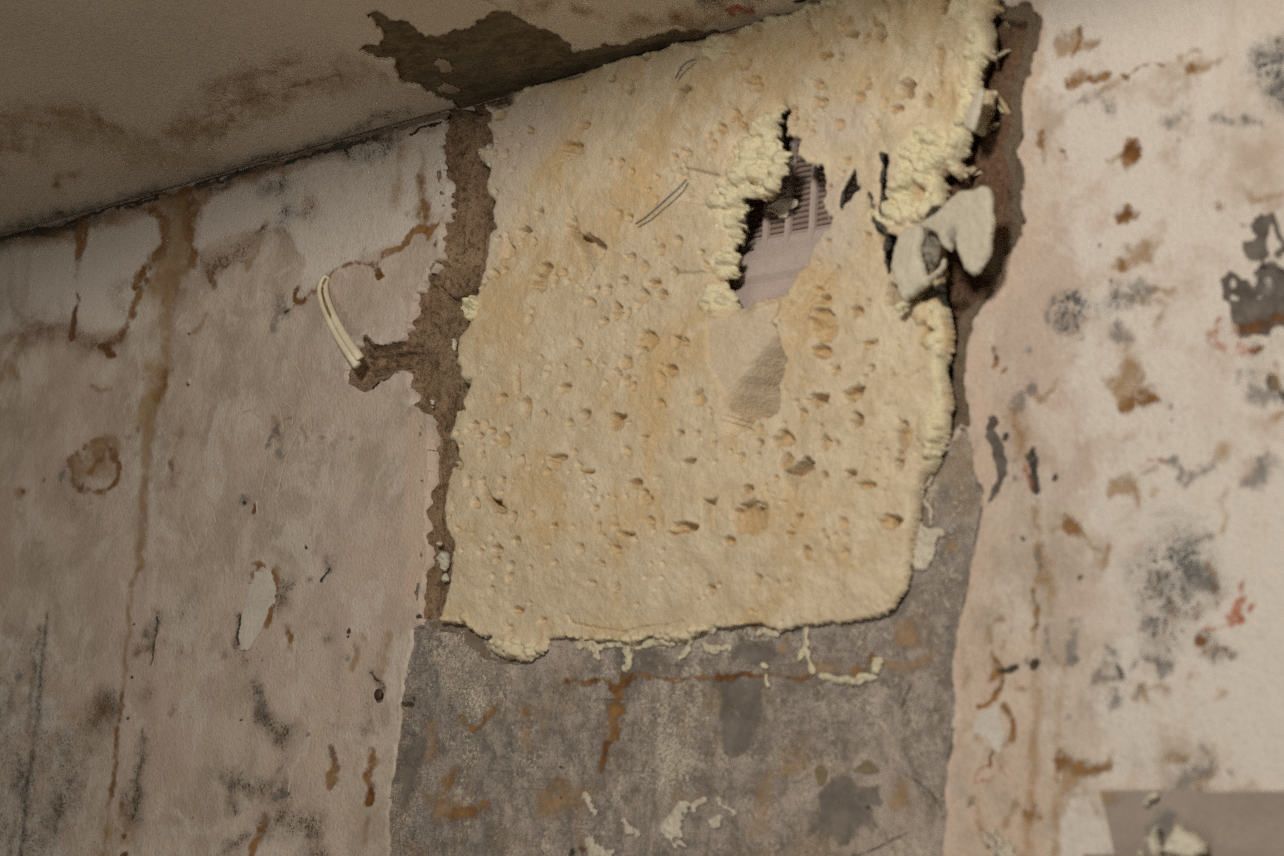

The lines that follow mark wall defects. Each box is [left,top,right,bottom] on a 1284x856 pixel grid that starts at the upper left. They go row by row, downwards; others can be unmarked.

damp [42,436,121,513]
damp [131,275,173,586]
flaking render [348,0,1042,856]
damp [0,616,146,856]
damp [123,604,186,679]
spalling [239,561,295,650]
corrosion [538,671,768,816]
damp [1092,511,1253,708]